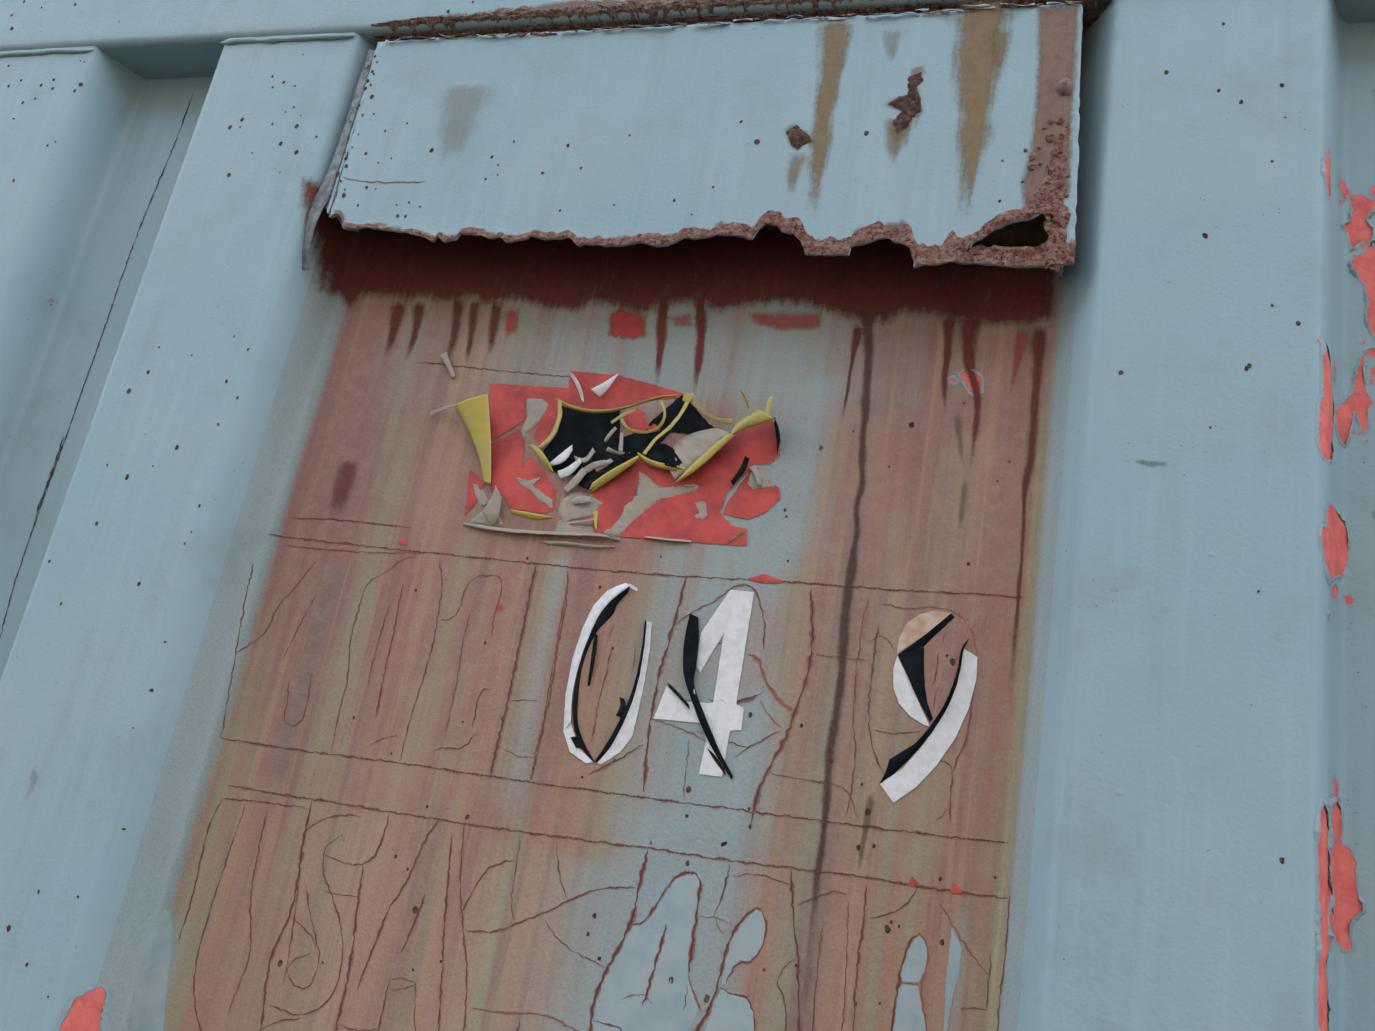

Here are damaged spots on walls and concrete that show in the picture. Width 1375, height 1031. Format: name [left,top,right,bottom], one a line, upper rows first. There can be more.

peeling [529,371,715,479]
rust [303,0,1112,920]
peeling [740,390,780,454]
peeling [1317,500,1357,622]
crack [220,517,1023,843]
peeling [563,574,782,793]
peeling [861,611,977,802]
crack [178,785,1010,1031]
peeling [1313,774,1366,1031]